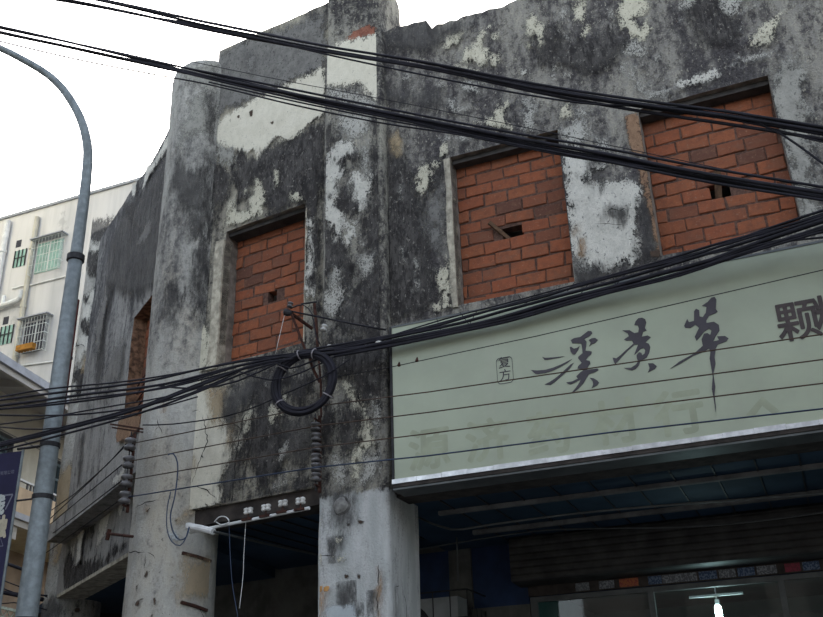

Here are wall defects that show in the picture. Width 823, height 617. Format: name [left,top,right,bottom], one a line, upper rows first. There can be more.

leakage [385,18,462,51]
leakage [529,19,629,74]
peeling [607,0,722,99]
leakage [685,0,743,47]
leakage [80,13,381,453]
peeling [131,24,377,278]
peeling [304,218,345,317]
leakage [387,122,446,323]
peeling [559,102,660,274]
leakage [71,367,84,398]
leakage [221,367,313,498]